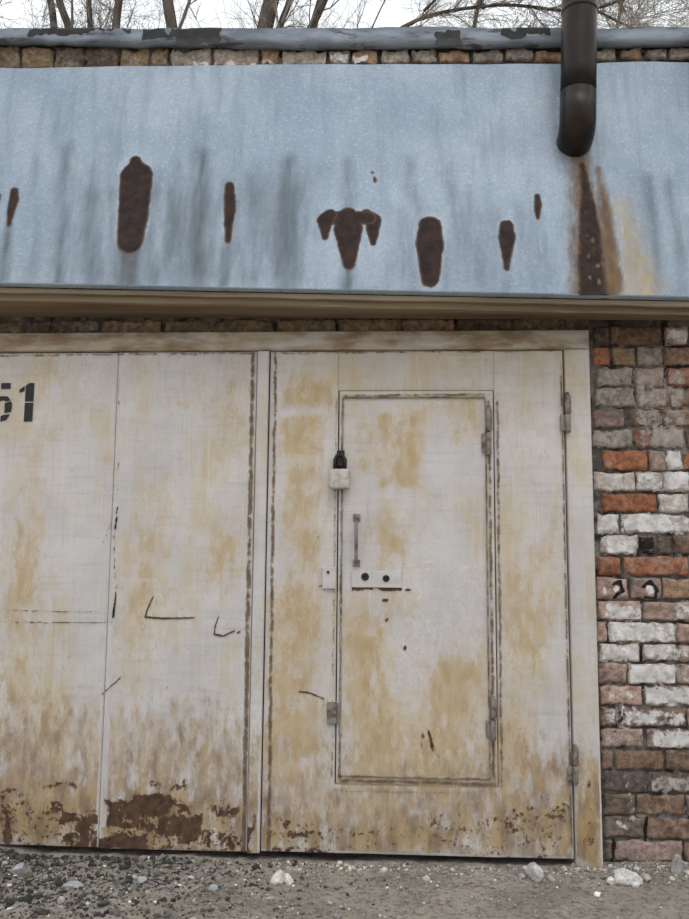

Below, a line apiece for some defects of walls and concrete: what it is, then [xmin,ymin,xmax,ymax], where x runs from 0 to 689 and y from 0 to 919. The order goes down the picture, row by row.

corrosion [0,187,19,255]
corrosion [117,156,153,285]
corrosion [224,182,236,248]
corrosion [317,207,381,288]
corrosion [415,216,444,287]
corrosion [498,220,516,271]
corrosion [534,194,542,219]
corrosion [570,155,630,299]
corrosion [0,352,601,867]